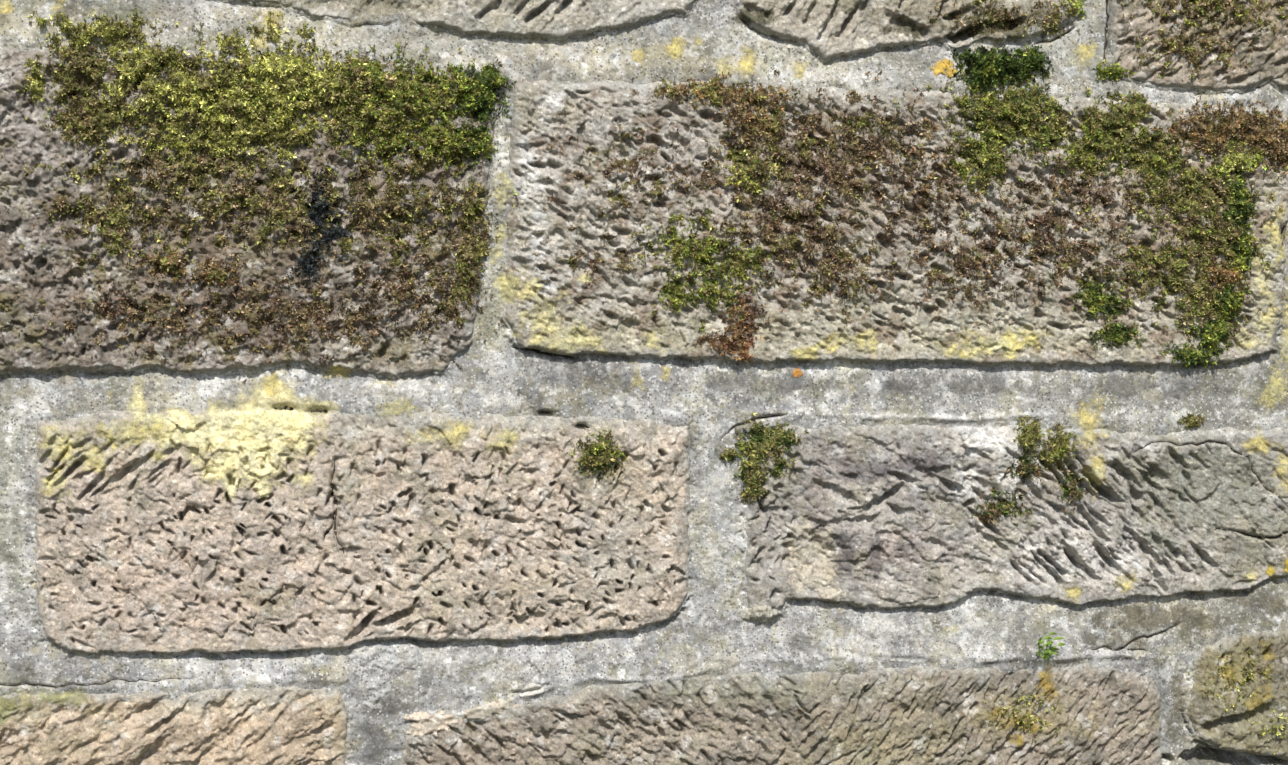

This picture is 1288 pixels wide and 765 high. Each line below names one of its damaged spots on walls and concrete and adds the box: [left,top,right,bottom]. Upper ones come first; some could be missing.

crack [1125,441,1288,548]
crack [1091,624,1178,651]
crack [0,678,190,688]